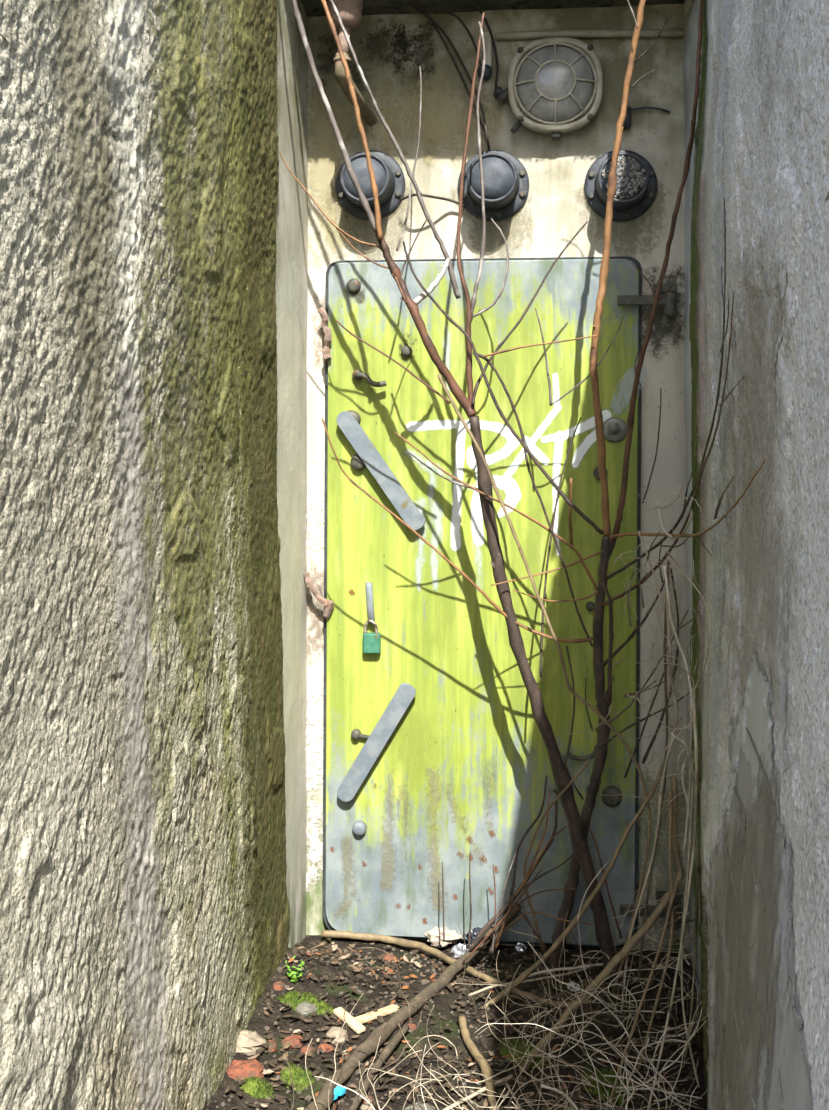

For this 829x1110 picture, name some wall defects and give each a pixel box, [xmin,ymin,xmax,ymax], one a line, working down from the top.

water stain [307,36,350,253]
water stain [349,19,500,162]
peeling [701,650,813,1110]